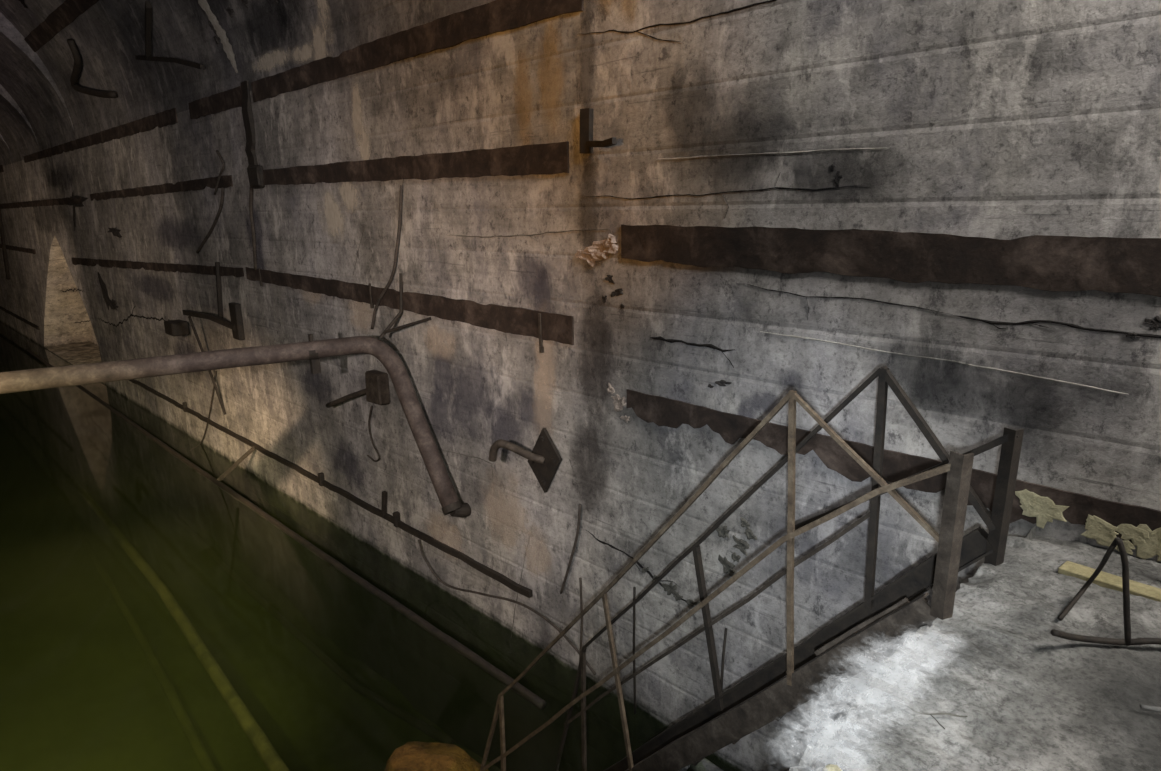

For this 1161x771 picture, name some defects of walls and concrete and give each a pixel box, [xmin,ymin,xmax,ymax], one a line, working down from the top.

crack [586,0,776,42]
crack [740,282,1161,340]
peeling [1015,489,1070,528]
spalling [1051,514,1161,646]